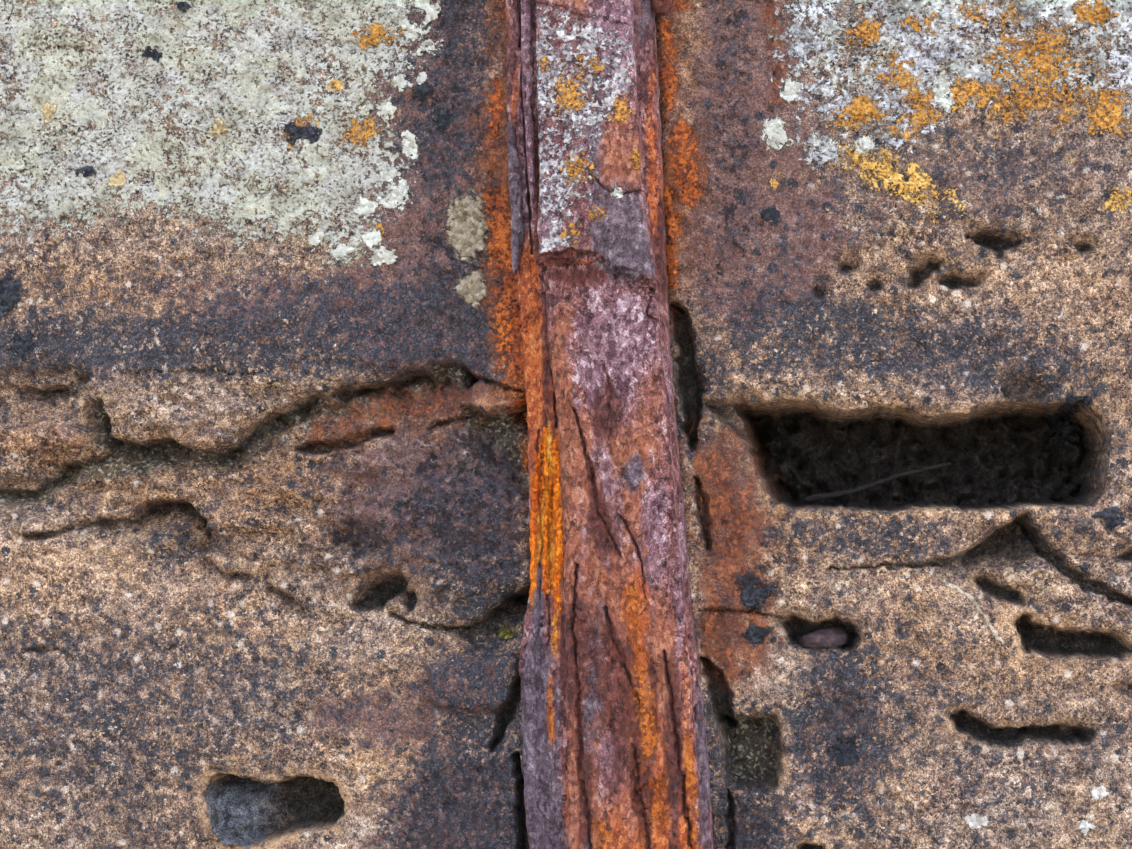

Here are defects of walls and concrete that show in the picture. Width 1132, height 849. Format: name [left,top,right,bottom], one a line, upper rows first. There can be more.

corrosion [655,0,708,333]
corrosion [470,73,564,611]
crack [646,295,709,451]
crack [5,362,648,849]
corrosion [547,670,556,754]
corrosion [626,586,669,825]
crack [663,650,692,848]
corrosion [684,735,699,849]
crack [691,478,714,552]
crack [699,655,740,726]
corrosion [693,416,785,688]
crack [828,512,1132,608]